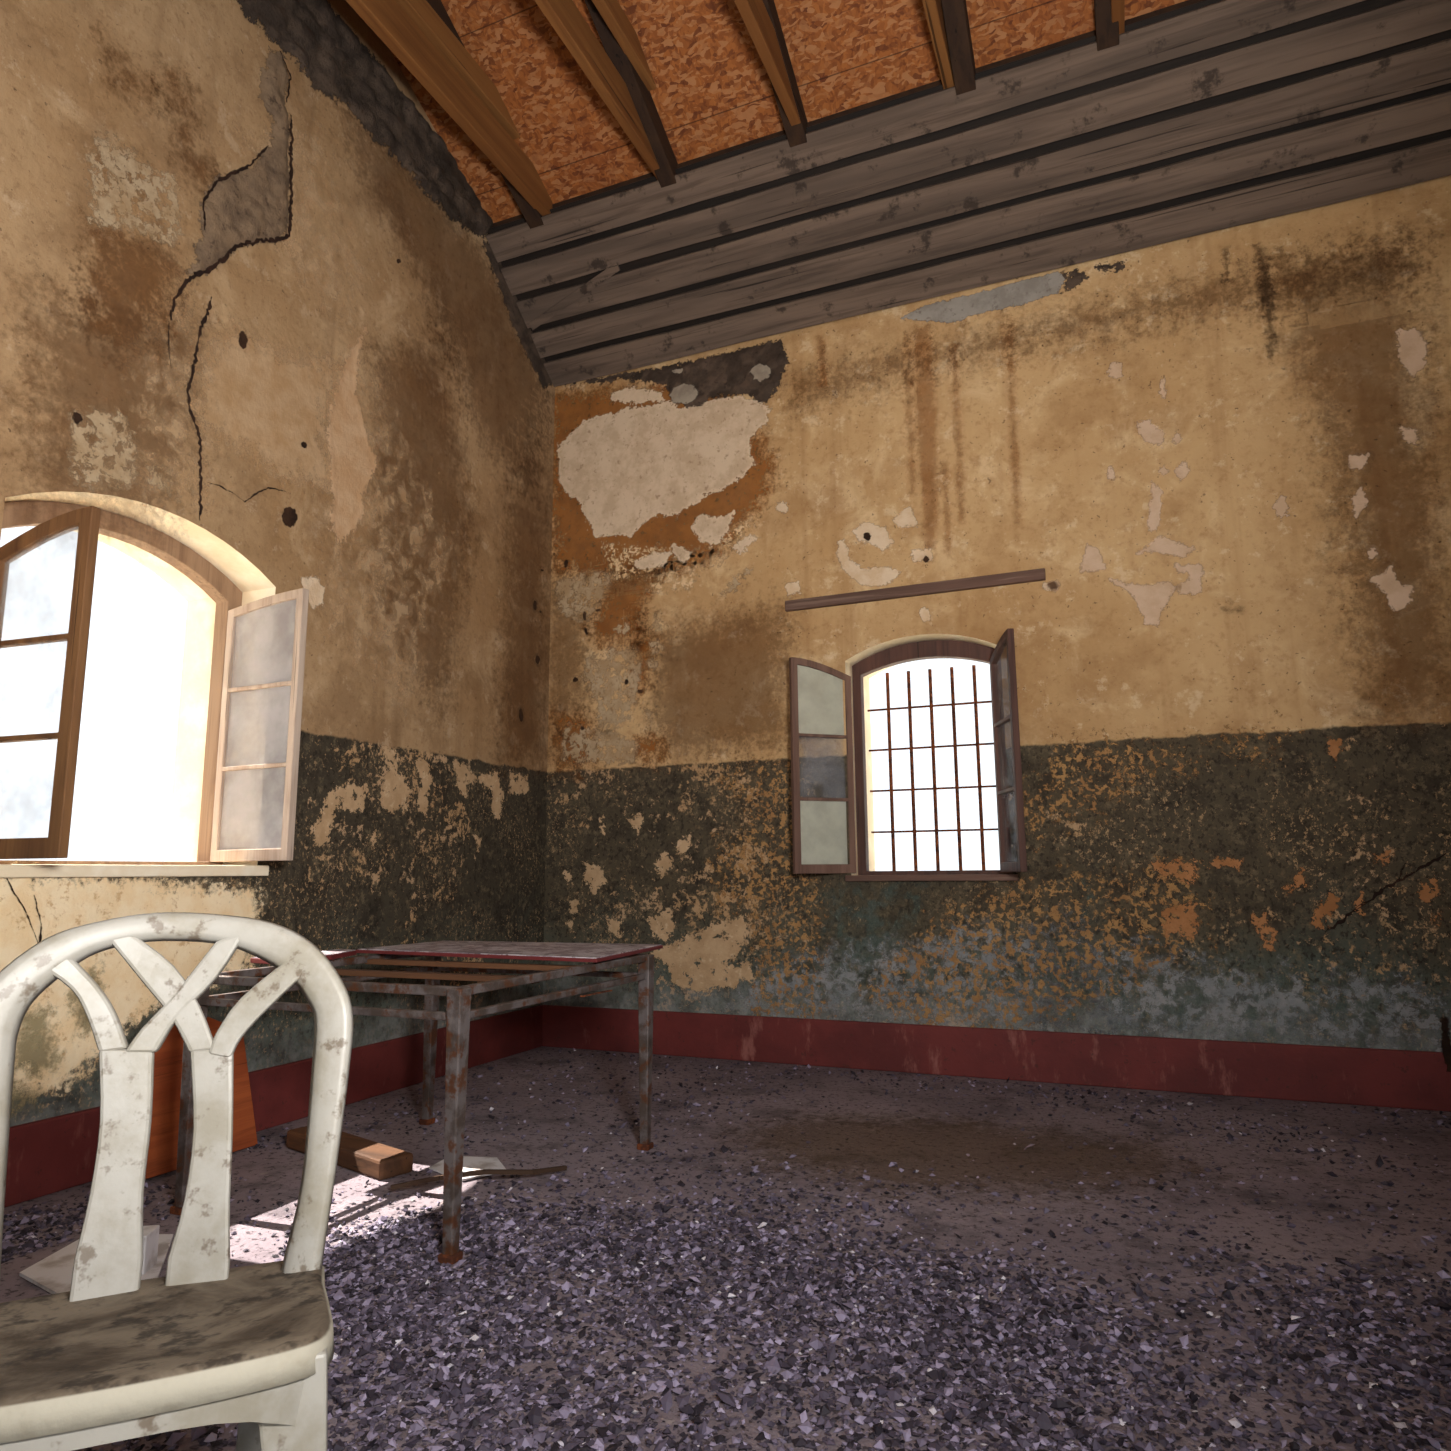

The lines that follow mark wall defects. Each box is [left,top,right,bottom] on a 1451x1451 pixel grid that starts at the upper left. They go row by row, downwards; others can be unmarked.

crack [168,51,294,519]
peeling [68,0,790,696]
peeling [1395,328,1428,378]
peeling [1398,426,1419,444]
peeling [1348,452,1370,518]
peeling [836,506,933,587]
peeling [1042,581,1060,591]
peeling [1079,462,1204,626]
peeling [1367,547,1414,612]
peeling [560,614,664,766]
crack [7,878,42,943]
leakage [721,906,1450,1052]